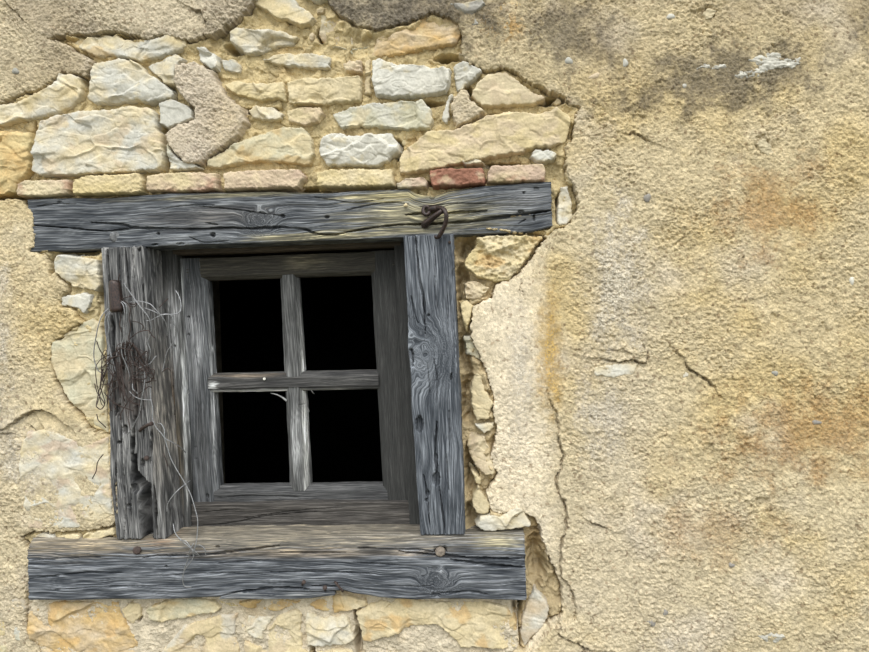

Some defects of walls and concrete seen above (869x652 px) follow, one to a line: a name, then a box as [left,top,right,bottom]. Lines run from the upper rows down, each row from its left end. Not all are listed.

spalling [0,0,579,652]
spalling [696,52,801,79]